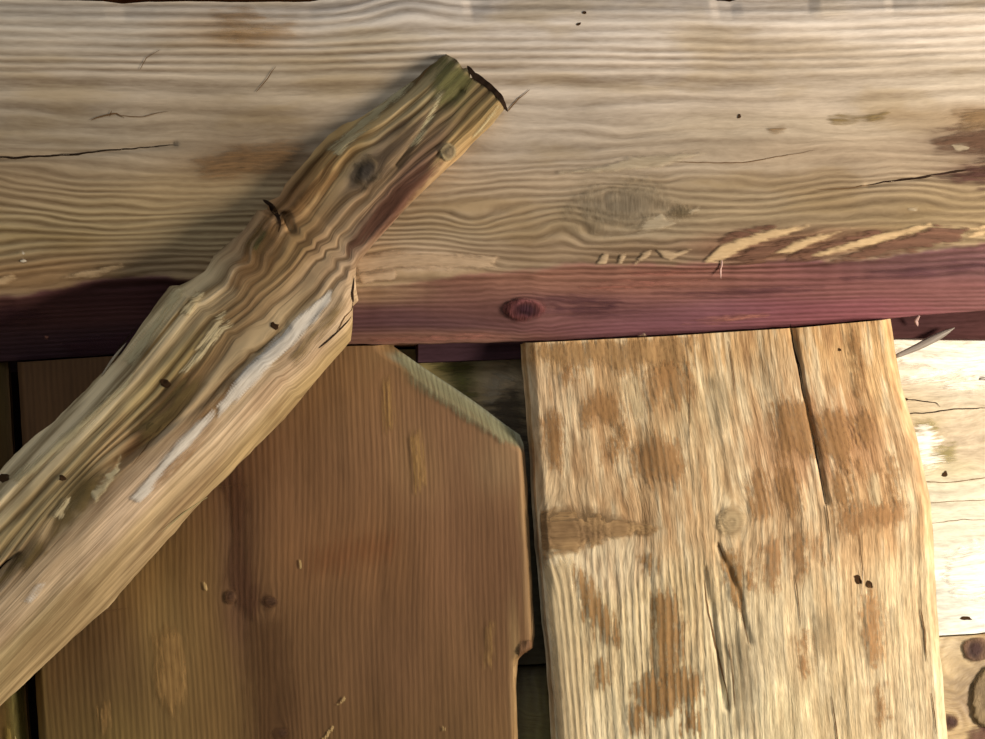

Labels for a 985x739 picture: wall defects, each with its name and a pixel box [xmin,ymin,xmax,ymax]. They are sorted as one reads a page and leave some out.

crack [92,110,168,120]
crack [0,145,179,159]
crack [673,150,813,163]
crack [822,168,983,190]
crack [790,324,833,560]